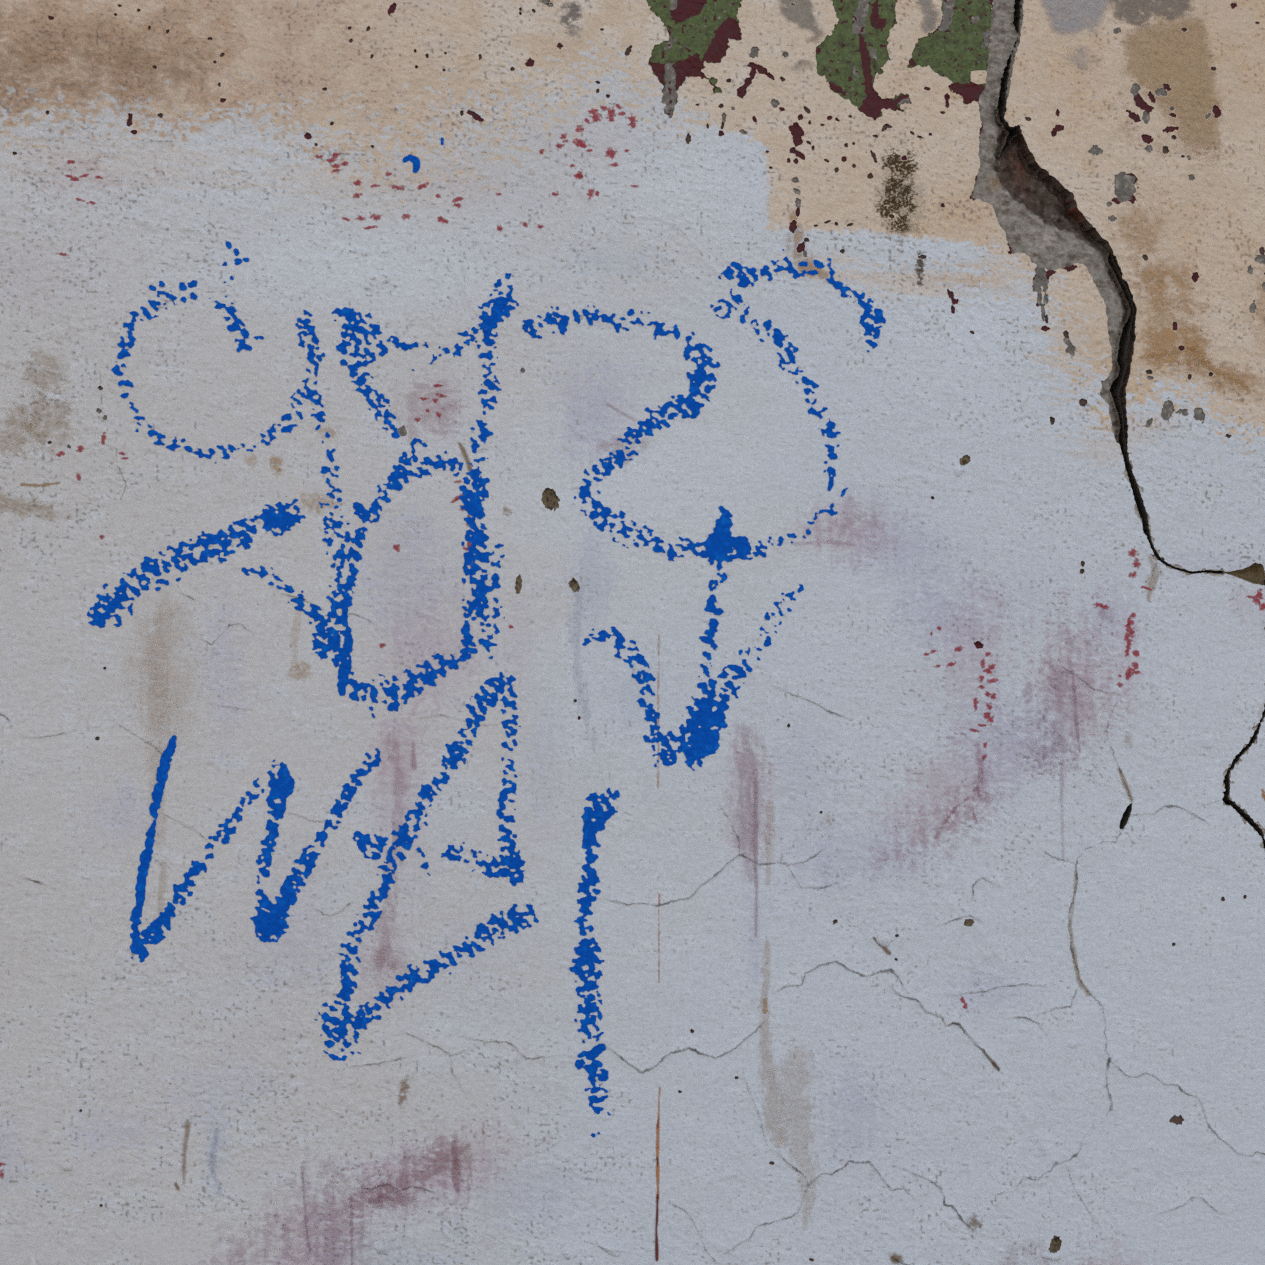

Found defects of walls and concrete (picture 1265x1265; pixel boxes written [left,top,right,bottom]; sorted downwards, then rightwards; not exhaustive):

peeling [646,0,785,136]
peeling [770,0,912,257]
crack [997,0,1022,157]
peeling [1043,0,1189,34]
spalling [1126,83,1195,181]
spalling [1205,104,1222,119]
spalling [907,0,1154,450]
spalling [1247,247,1265,314]
spalling [1145,397,1205,428]
crack [1108,252,1265,586]
crack [1119,803,1132,829]
crack [1222,683,1265,859]